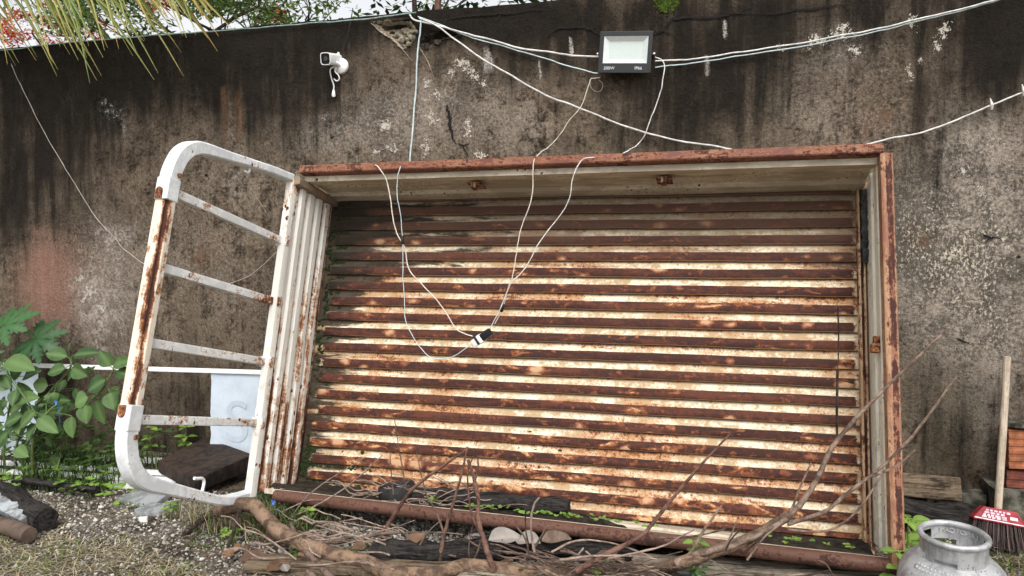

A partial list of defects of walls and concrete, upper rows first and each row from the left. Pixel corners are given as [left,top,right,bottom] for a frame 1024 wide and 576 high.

spalling [372,17,463,50]
crack [445,105,470,157]